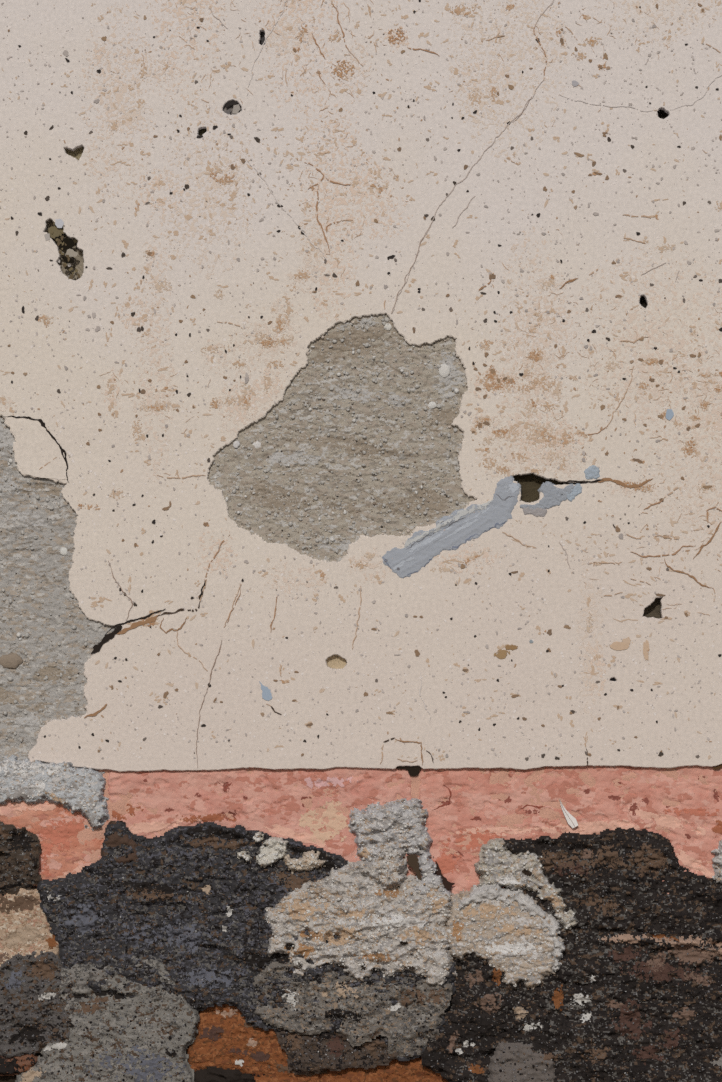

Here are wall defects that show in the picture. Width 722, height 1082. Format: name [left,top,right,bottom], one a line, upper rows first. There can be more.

crack [384,0,722,314]
hole [37,196,84,281]
crack [1,415,69,482]
spalling [207,314,487,562]
crack [560,478,679,510]
spalling [0,416,118,762]
crack [502,502,722,600]
crack [91,540,242,791]
spalling [608,782,650,815]